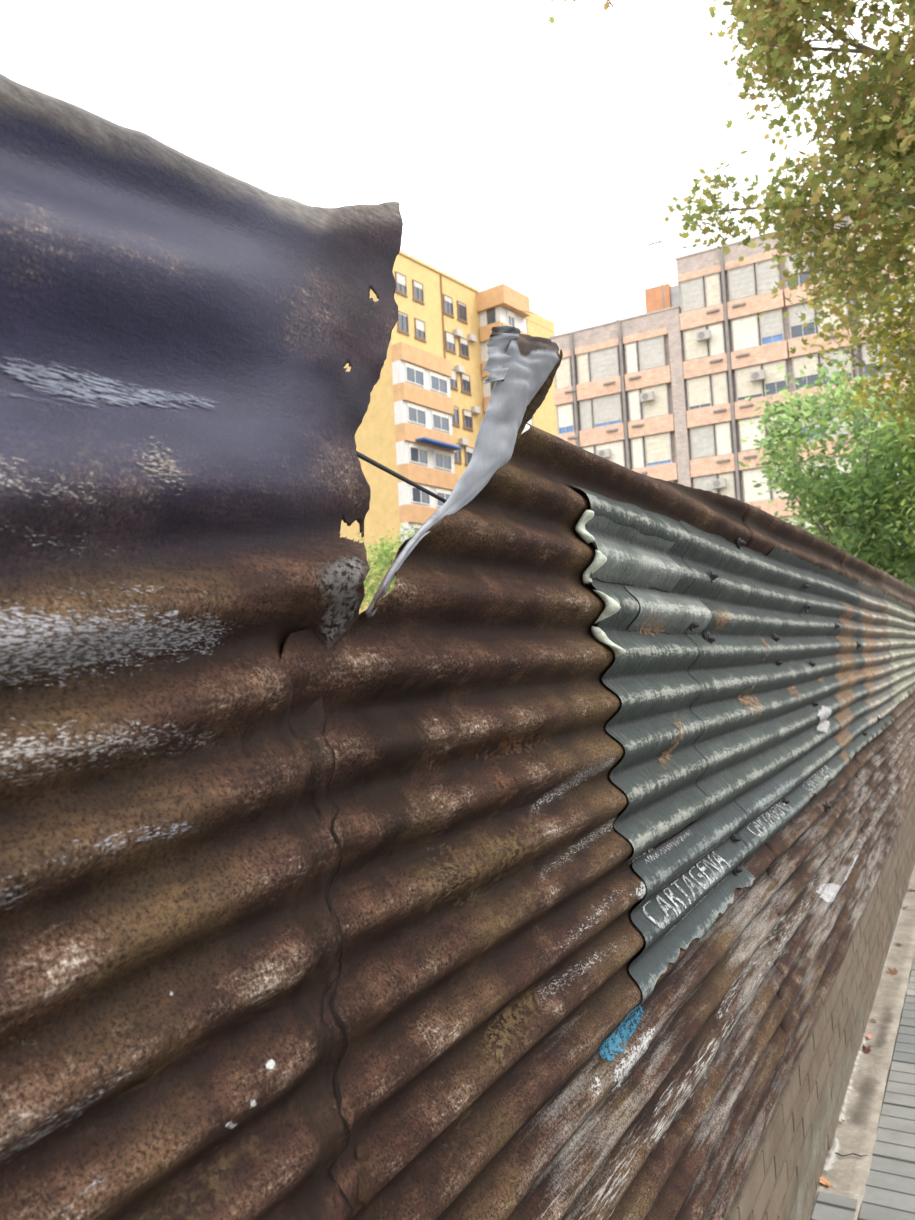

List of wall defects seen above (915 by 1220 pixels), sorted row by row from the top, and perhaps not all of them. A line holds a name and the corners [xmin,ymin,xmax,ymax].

crack [305,691,356,1220]